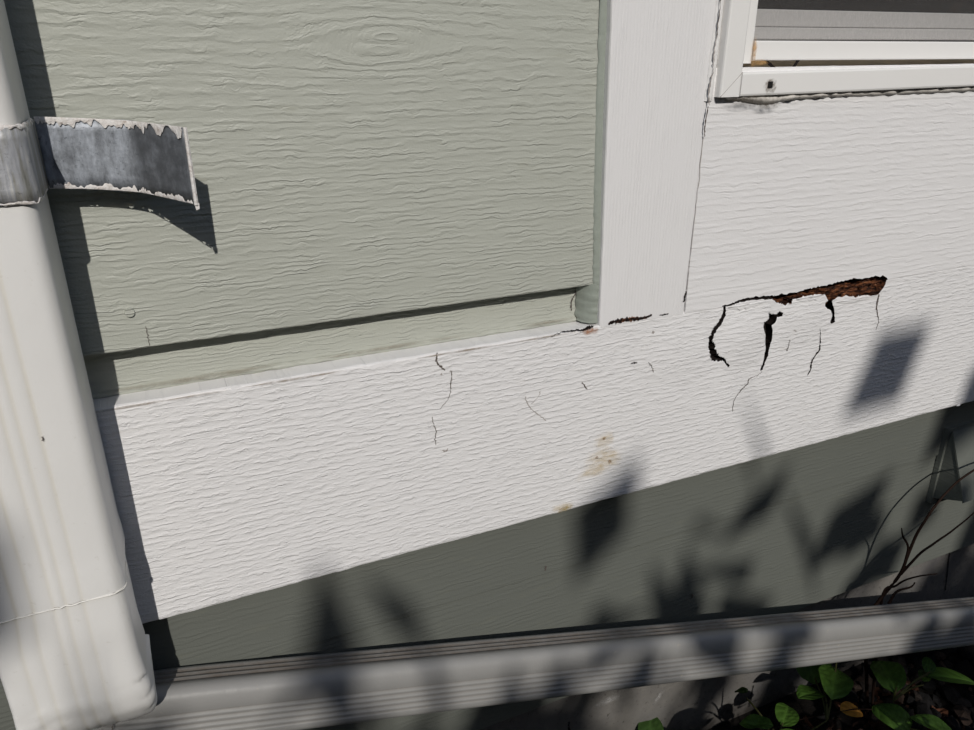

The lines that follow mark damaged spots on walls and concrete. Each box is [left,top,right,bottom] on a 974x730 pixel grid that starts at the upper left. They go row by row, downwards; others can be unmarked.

crack [708,295,772,365]
crack [808,304,828,374]